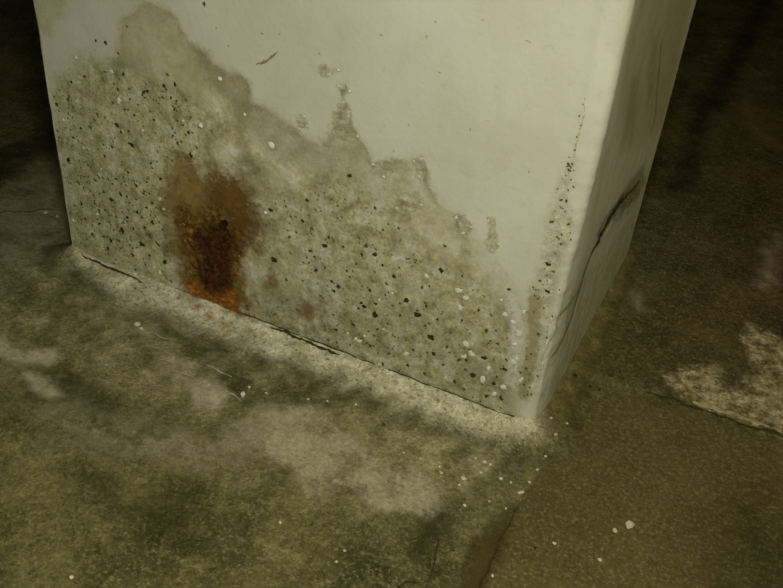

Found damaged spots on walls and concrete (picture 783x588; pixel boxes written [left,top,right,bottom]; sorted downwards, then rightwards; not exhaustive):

water stain [0,340,59,397]
spalling [53,55,215,284]
corrosion [164,156,264,316]
spalling [263,149,576,413]
crack [543,168,644,356]
water stain [236,406,447,588]
crack [462,505,519,588]